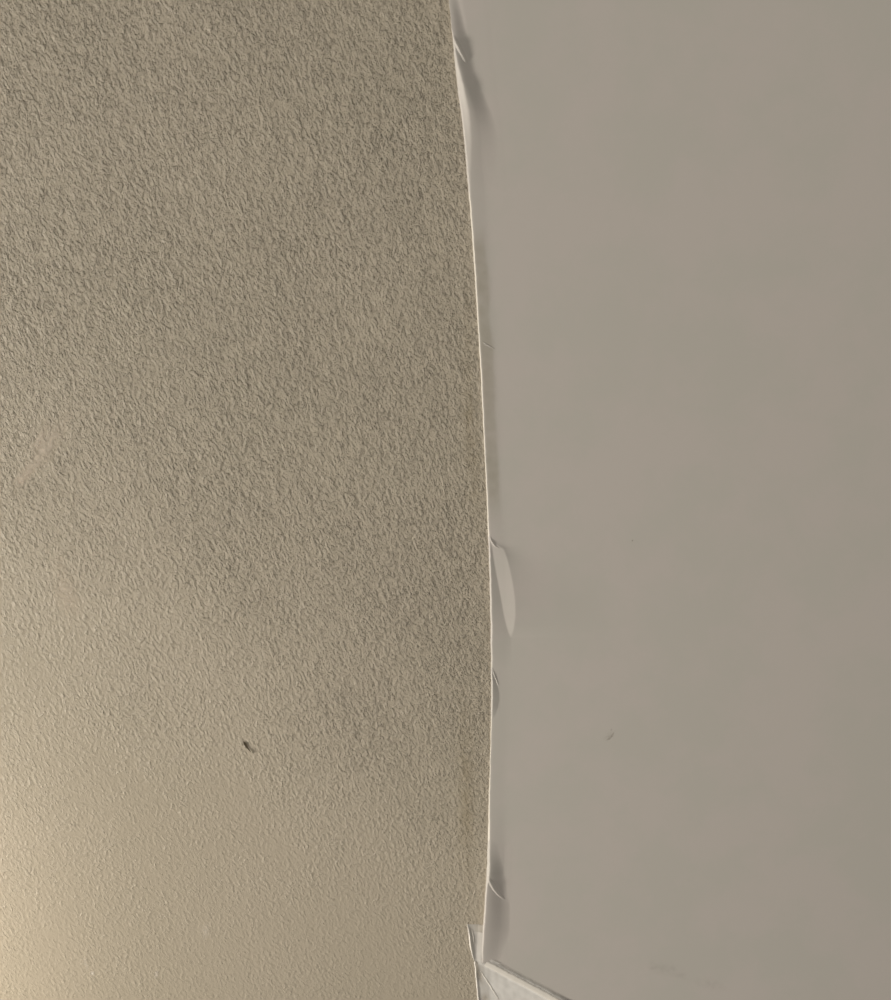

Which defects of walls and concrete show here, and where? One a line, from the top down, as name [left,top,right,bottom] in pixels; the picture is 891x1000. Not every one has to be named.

peeling [482,840,513,963]